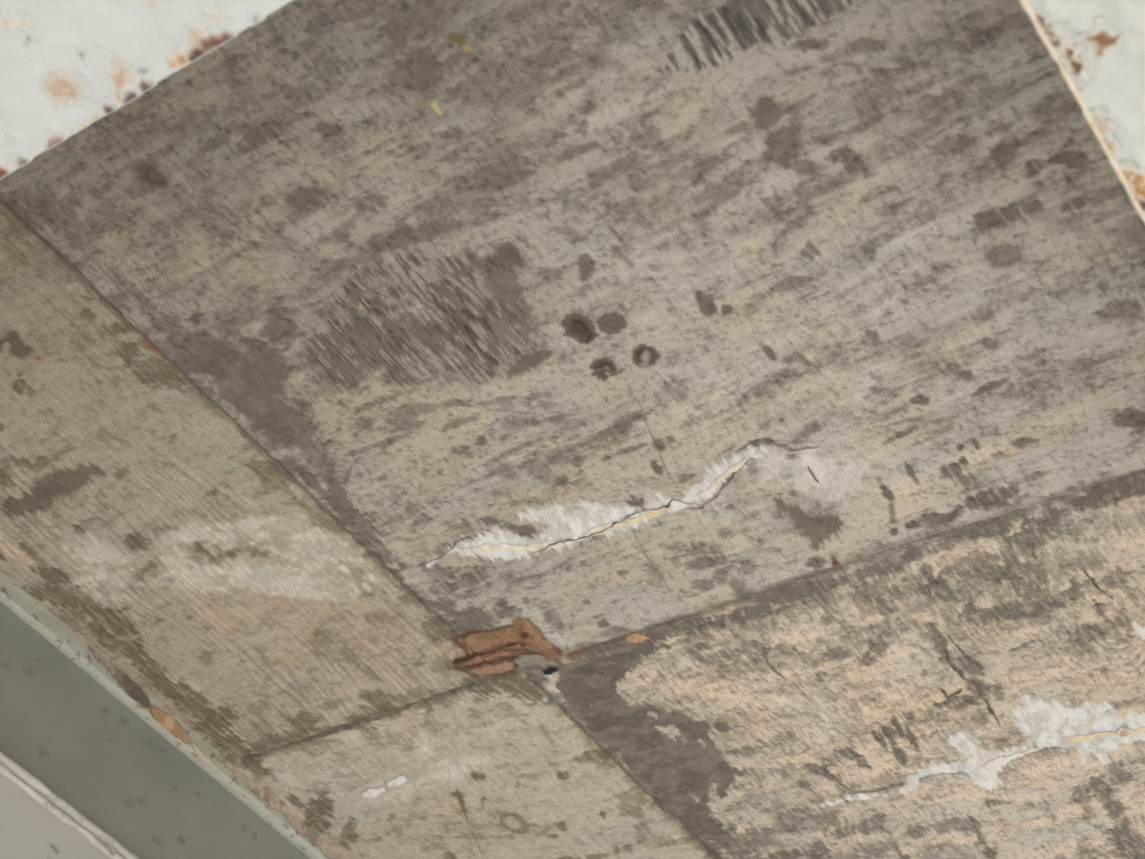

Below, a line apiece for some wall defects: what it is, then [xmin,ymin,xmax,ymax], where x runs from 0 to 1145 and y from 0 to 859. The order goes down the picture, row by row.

rust [161,21,238,73]
rust [0,49,157,179]
rust [1117,160,1145,218]
crack [416,386,886,597]
crack [1070,569,1145,642]
peeling [445,615,738,848]
crack [817,635,1145,811]
crack [966,814,995,857]